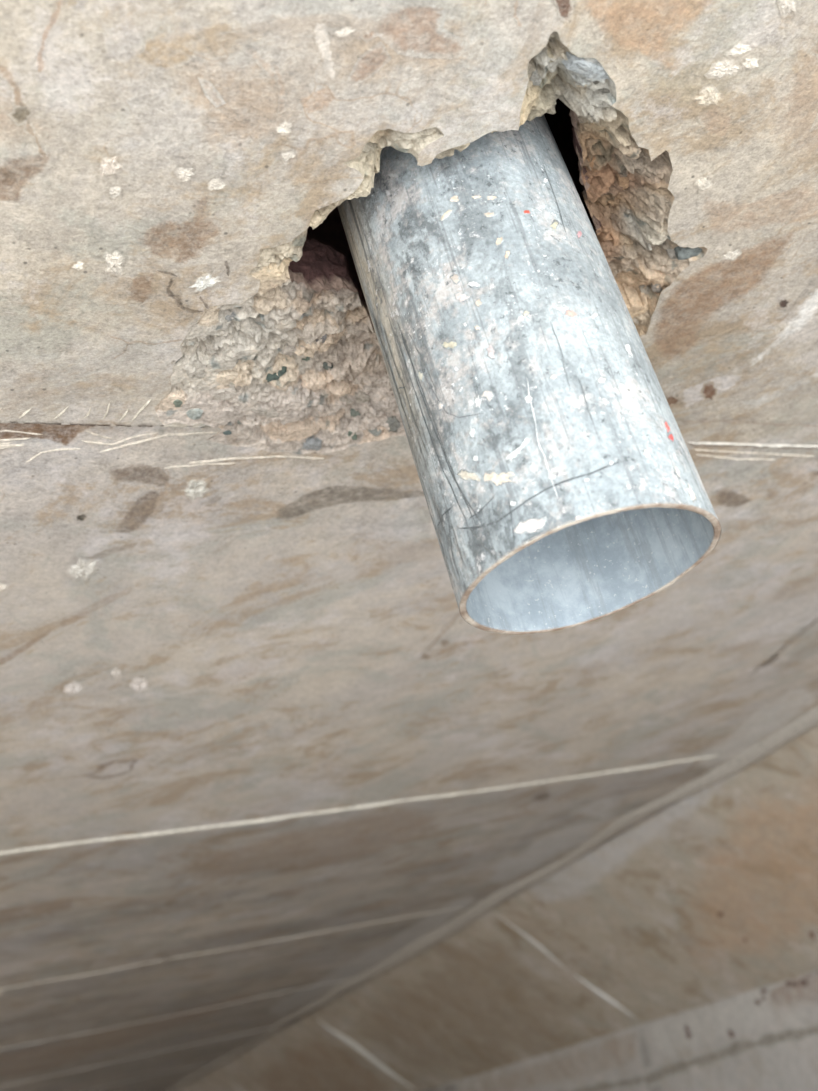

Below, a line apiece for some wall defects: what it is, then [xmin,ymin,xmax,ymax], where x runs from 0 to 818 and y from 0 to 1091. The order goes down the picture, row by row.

spalling [275,119,294,137]
spalling [519,0,708,337]
spalling [694,175,715,193]
spalling [721,248,742,261]
spalling [155,127,470,455]
rust [754,971,818,1015]